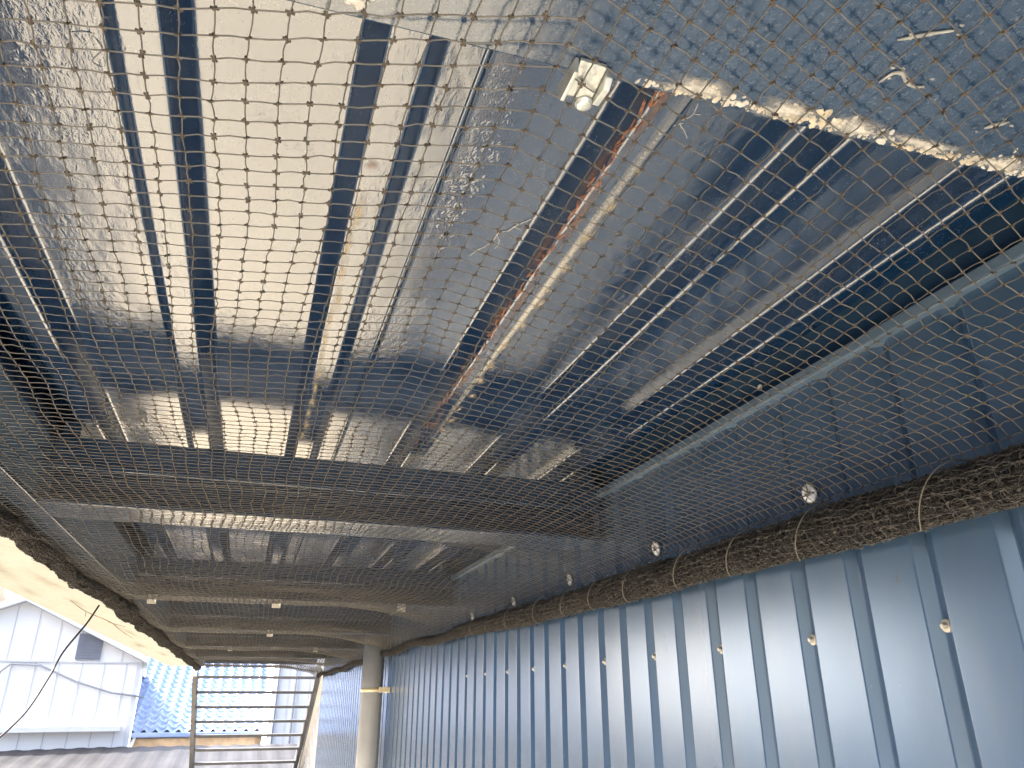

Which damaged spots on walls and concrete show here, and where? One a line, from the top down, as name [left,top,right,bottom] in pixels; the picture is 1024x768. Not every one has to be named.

peeling [878,66,935,88]
peeling [635,78,1024,178]
corrosion [415,90,668,448]